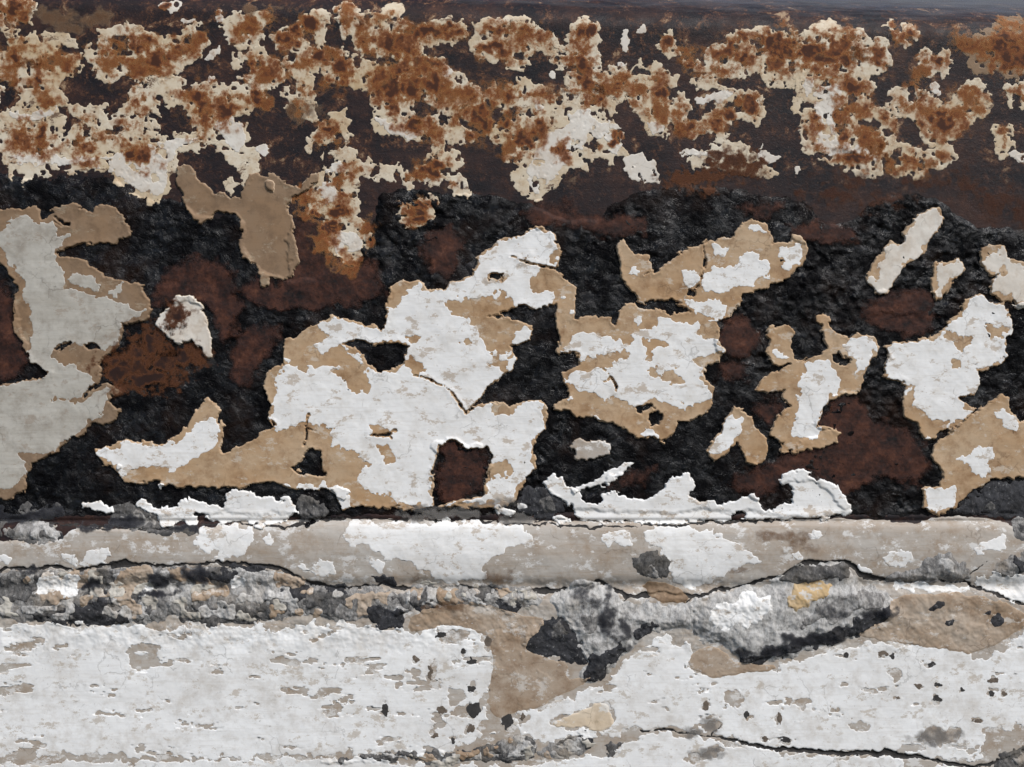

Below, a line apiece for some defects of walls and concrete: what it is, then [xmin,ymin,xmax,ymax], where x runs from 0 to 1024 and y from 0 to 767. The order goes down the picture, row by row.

rust [0,0,767,197]
peeling [0,0,1024,288]
rust [660,16,1024,178]
rust [86,161,383,396]
rust [436,443,487,503]
peeling [0,202,1024,767]
rust [733,396,929,498]
crack [0,558,411,591]
crack [532,586,567,595]
crack [594,579,651,602]
crack [684,559,1024,605]
crack [640,724,999,767]